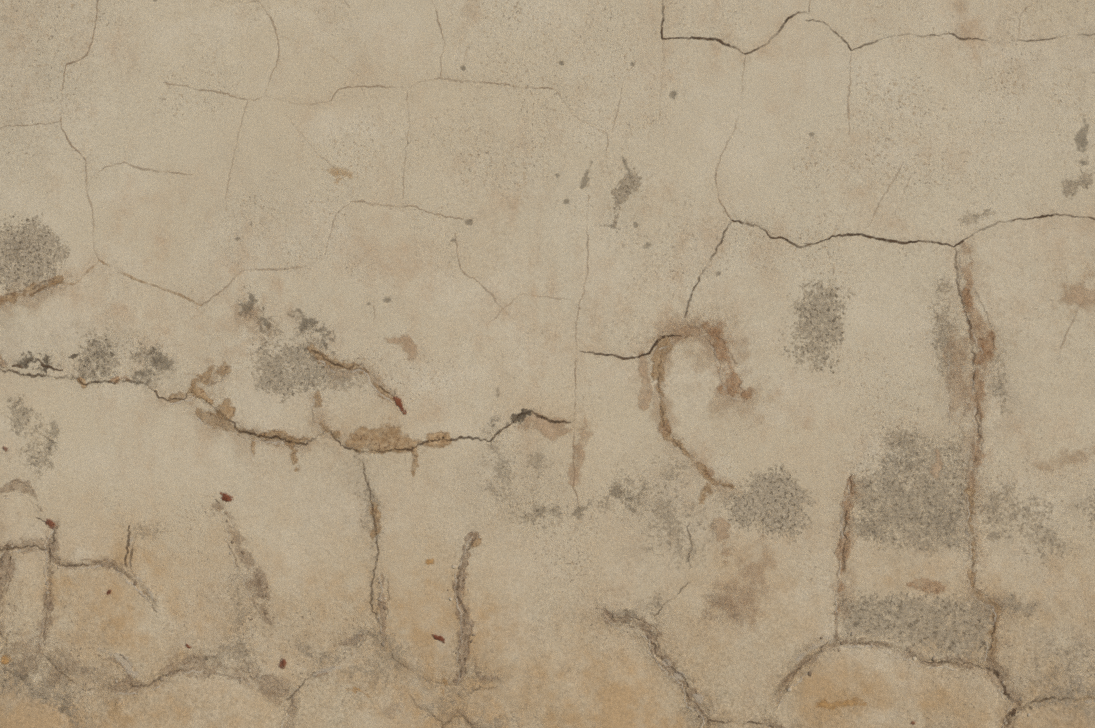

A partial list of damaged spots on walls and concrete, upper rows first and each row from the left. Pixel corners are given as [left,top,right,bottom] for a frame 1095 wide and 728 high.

crack [661,19,758,54]
crack [782,13,866,51]
crack [716,207,964,250]
crack [1013,213,1094,221]
crack [582,278,734,562]
corrosion [703,323,751,400]
crack [932,279,994,425]
crack [0,327,590,686]
crack [604,593,718,728]
crack [749,484,1095,728]